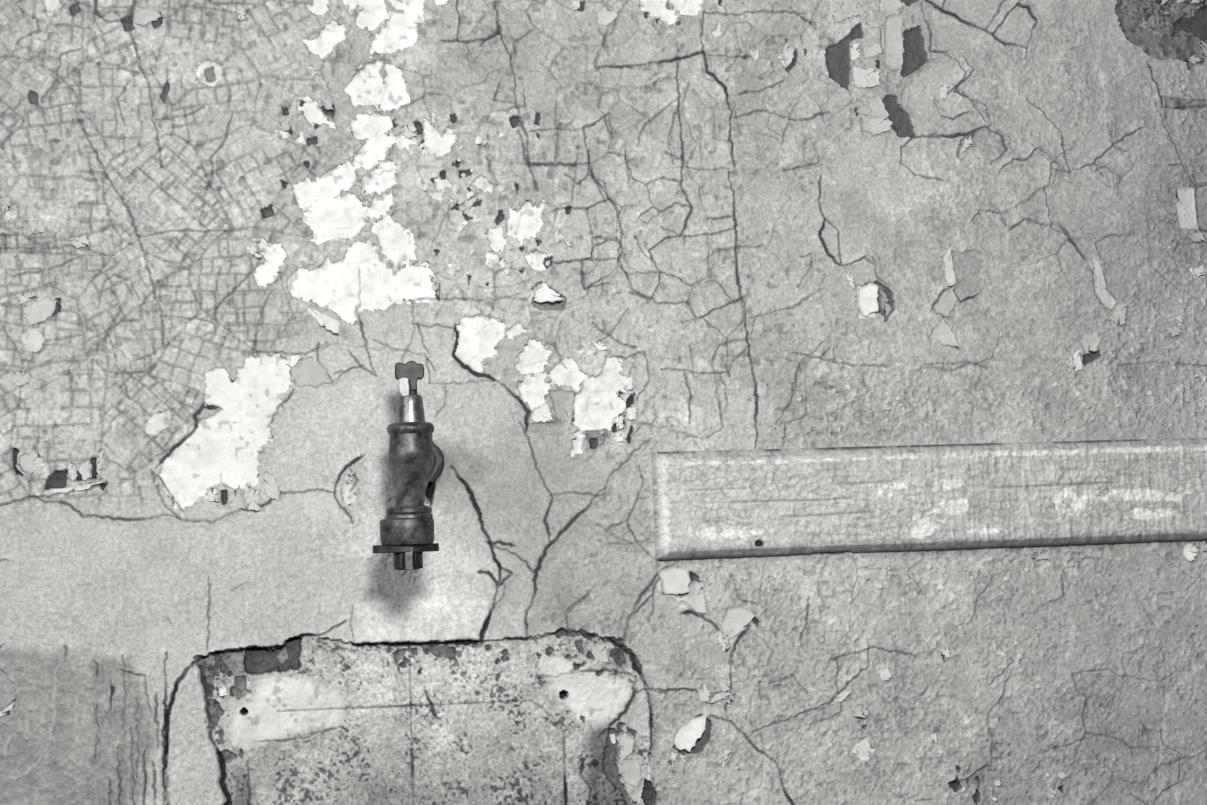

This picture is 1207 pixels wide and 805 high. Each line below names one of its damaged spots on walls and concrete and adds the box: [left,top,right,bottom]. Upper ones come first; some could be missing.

crack [0,0,521,418]
peeling [246,0,571,334]
crack [442,0,892,449]
peeling [825,0,928,138]
crack [897,0,1207,239]
flaking render [1115,0,1207,70]
crack [0,455,366,525]
peeling [155,353,332,513]
peeling [452,313,637,458]
crack [1118,360,1207,368]
flaking render [165,566,760,805]
crack [95,422,915,805]